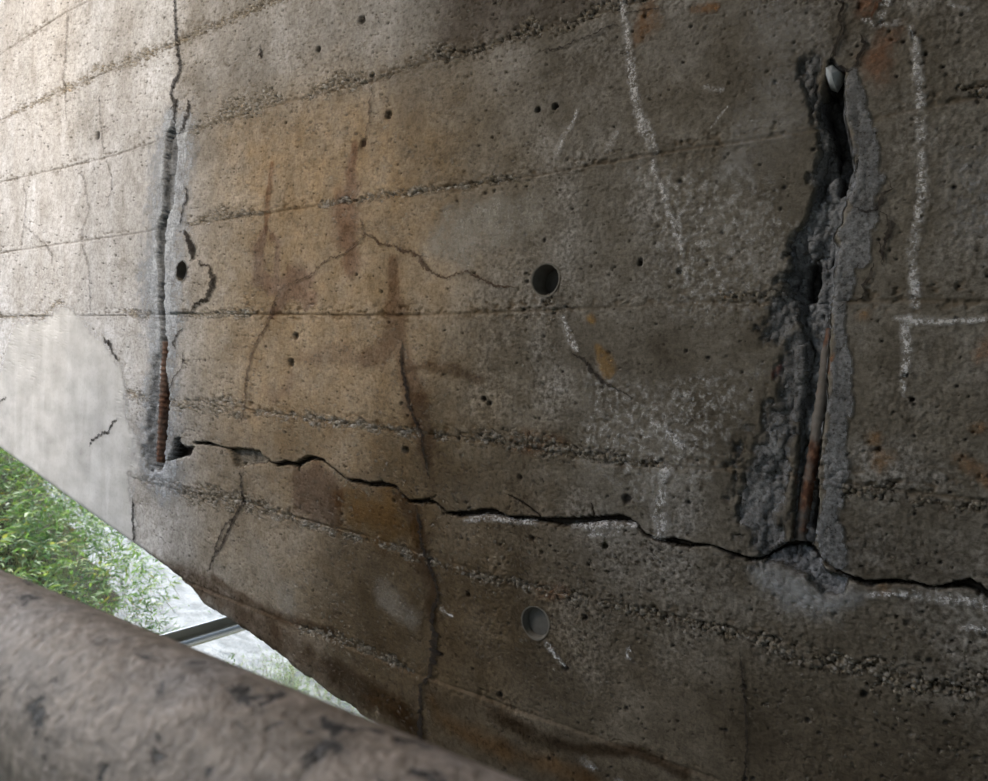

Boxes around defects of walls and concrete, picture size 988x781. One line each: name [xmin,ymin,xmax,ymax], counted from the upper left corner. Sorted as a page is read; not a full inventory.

crack [169,0,190,134]
crack [356,82,374,151]
crack [240,218,517,426]
spalling [733,55,885,594]
crack [197,442,246,570]
crack [269,340,988,740]
crack [739,652,749,781]